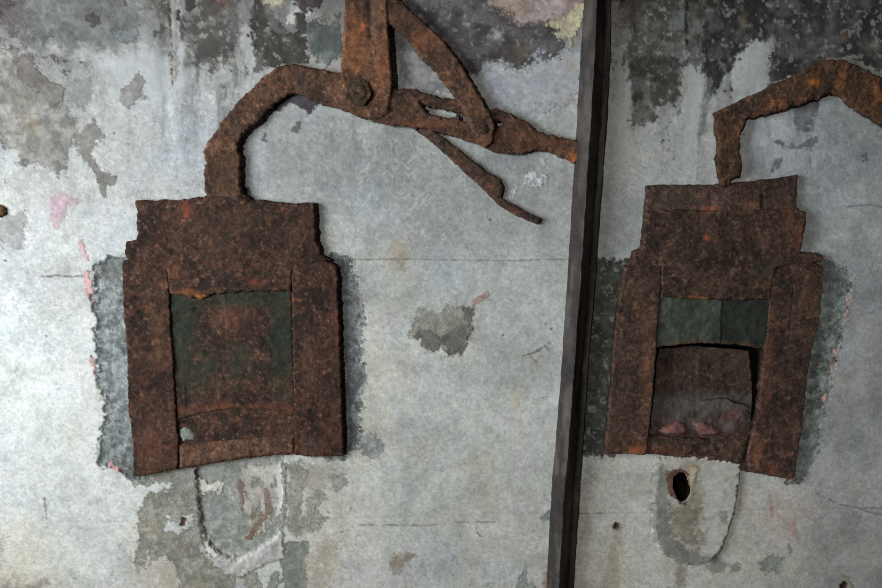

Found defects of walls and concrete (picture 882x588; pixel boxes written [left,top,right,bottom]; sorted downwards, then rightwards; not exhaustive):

water stain [120,71,146,109]
water stain [0,47,116,197]
water stain [512,157,548,197]
spalling [665,465,698,506]